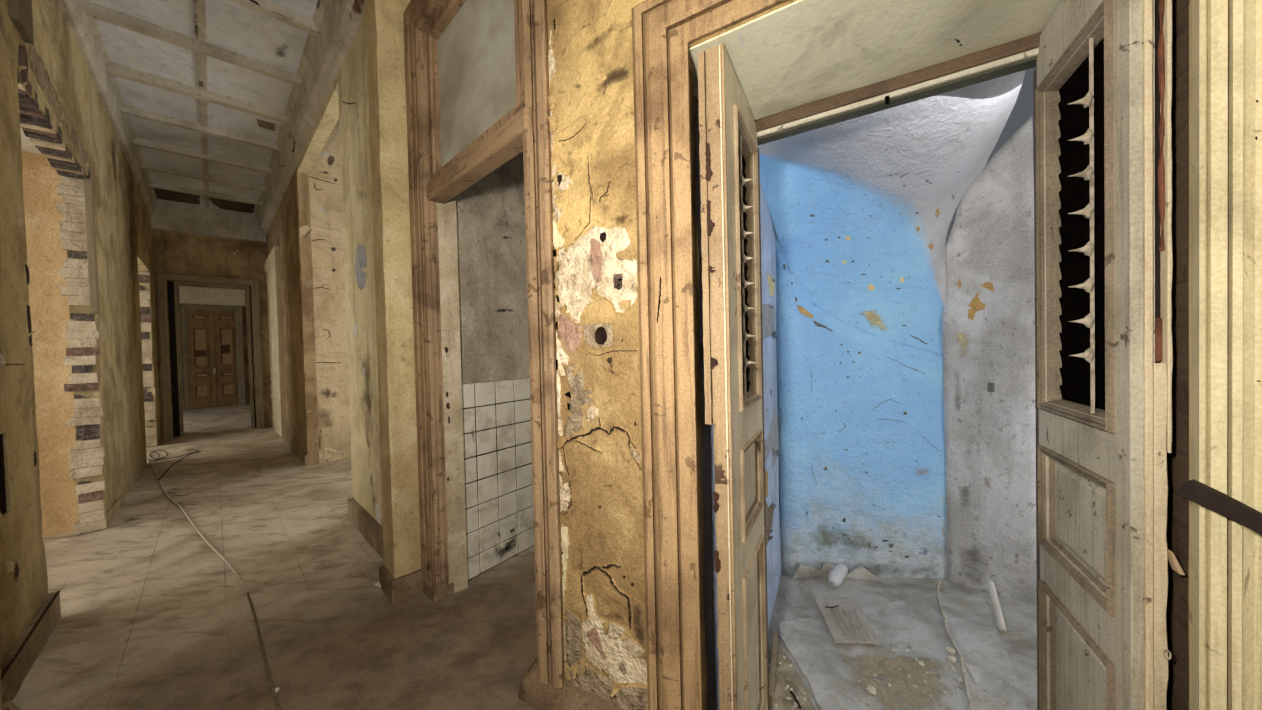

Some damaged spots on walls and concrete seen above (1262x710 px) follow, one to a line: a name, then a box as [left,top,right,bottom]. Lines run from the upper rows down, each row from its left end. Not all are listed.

flaking render [553,223,638,439]
peeling [967,282,995,321]
crack [558,417,642,630]
peeling [764,390,781,546]
peeling [566,593,648,710]